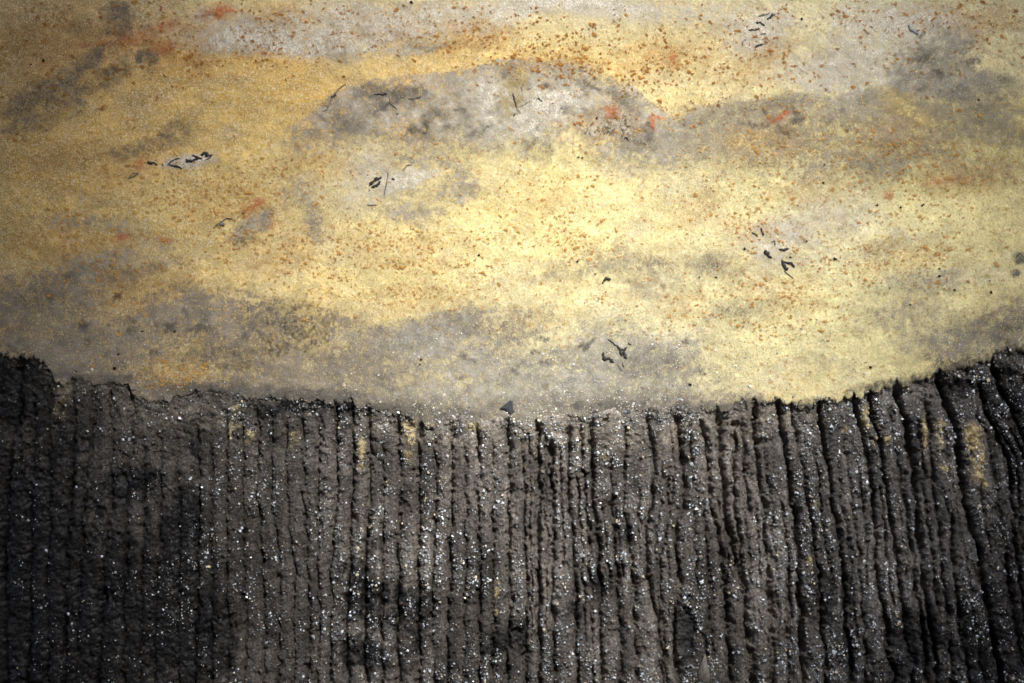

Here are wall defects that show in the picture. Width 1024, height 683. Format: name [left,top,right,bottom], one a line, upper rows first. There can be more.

rust [0,0,1024,348]
water stain [283,26,1024,226]
water stain [0,216,817,471]
spalling [500,400,515,415]
peeling [602,339,632,371]
spalling [672,596,710,683]